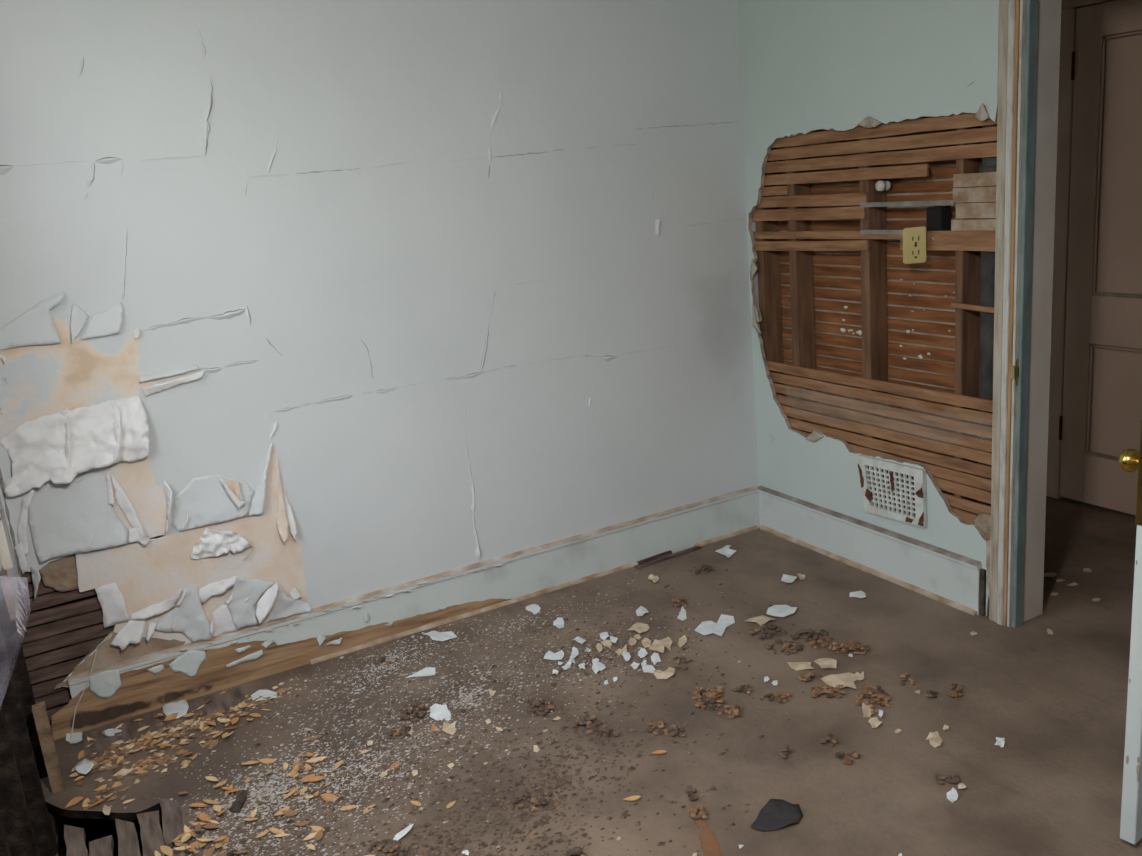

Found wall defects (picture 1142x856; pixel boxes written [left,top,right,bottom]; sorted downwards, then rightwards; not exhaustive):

crack [244,126,408,197]
crack [449,71,734,179]
flaking render [0,290,207,439]
crack [143,304,289,372]
crack [269,290,758,418]
flaking render [750,103,997,596]
crack [464,406,481,562]